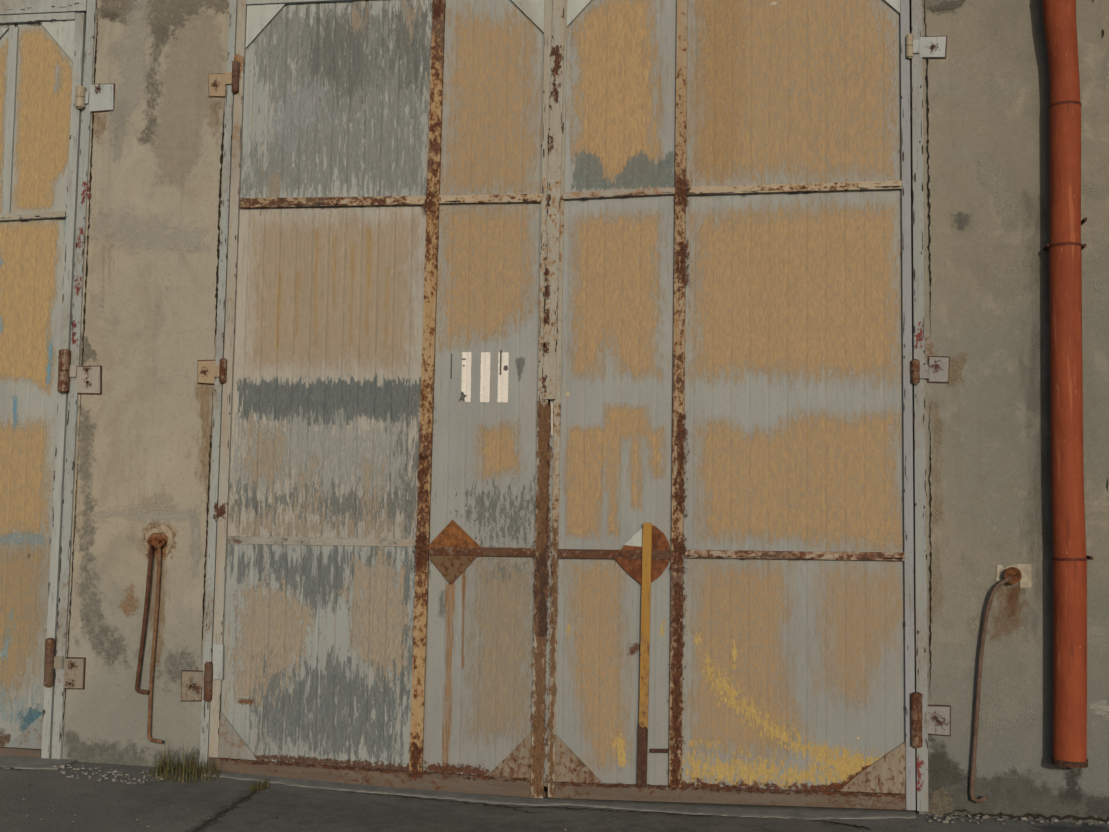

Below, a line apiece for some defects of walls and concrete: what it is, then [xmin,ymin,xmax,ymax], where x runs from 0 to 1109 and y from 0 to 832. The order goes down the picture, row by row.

leakage [100,0,230,143]
peeling [221,0,432,215]
corrosion [549,45,564,109]
corrosion [543,268,551,326]
corrosion [675,239,690,286]
leakage [77,496,126,662]
peeling [184,374,421,765]
peeling [451,463,539,585]
corrosion [220,375,906,799]
peeling [682,632,885,790]
crack [193,786,260,832]
leakage [928,738,1109,832]